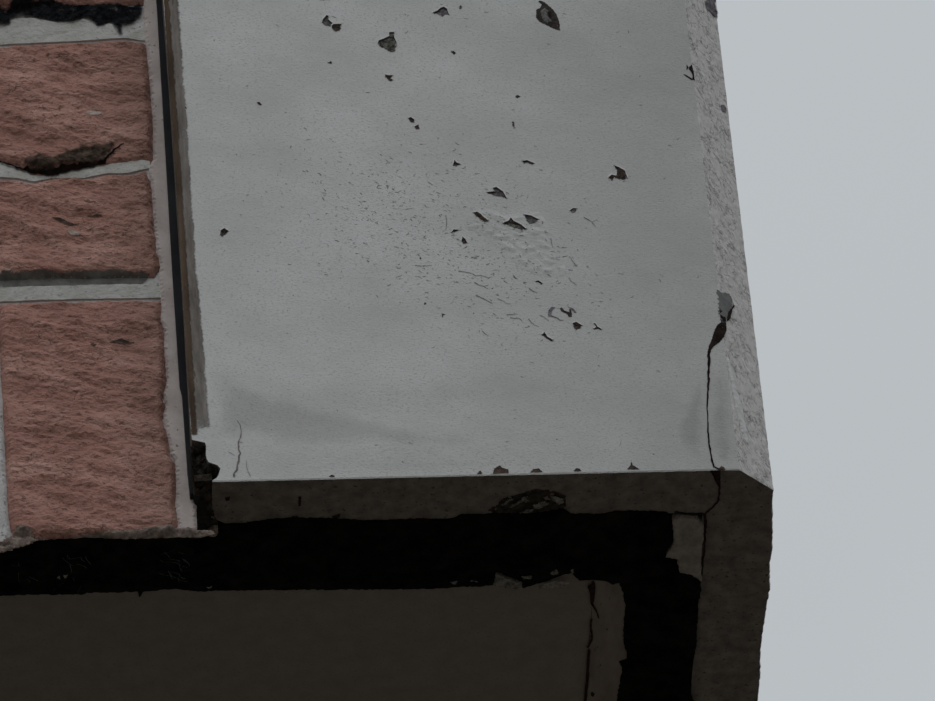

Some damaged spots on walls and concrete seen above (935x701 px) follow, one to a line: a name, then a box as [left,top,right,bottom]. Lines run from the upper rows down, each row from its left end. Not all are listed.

peeling [321,15,342,32]
peeling [432,5,462,17]
spalling [536,1,560,30]
peeling [377,31,397,52]
peeling [607,165,628,180]
peeling [487,186,507,198]
peeling [503,214,539,230]
crack [674,298,735,575]
peeling [488,490,566,514]
spalling [0,525,49,553]
peeling [494,569,575,590]